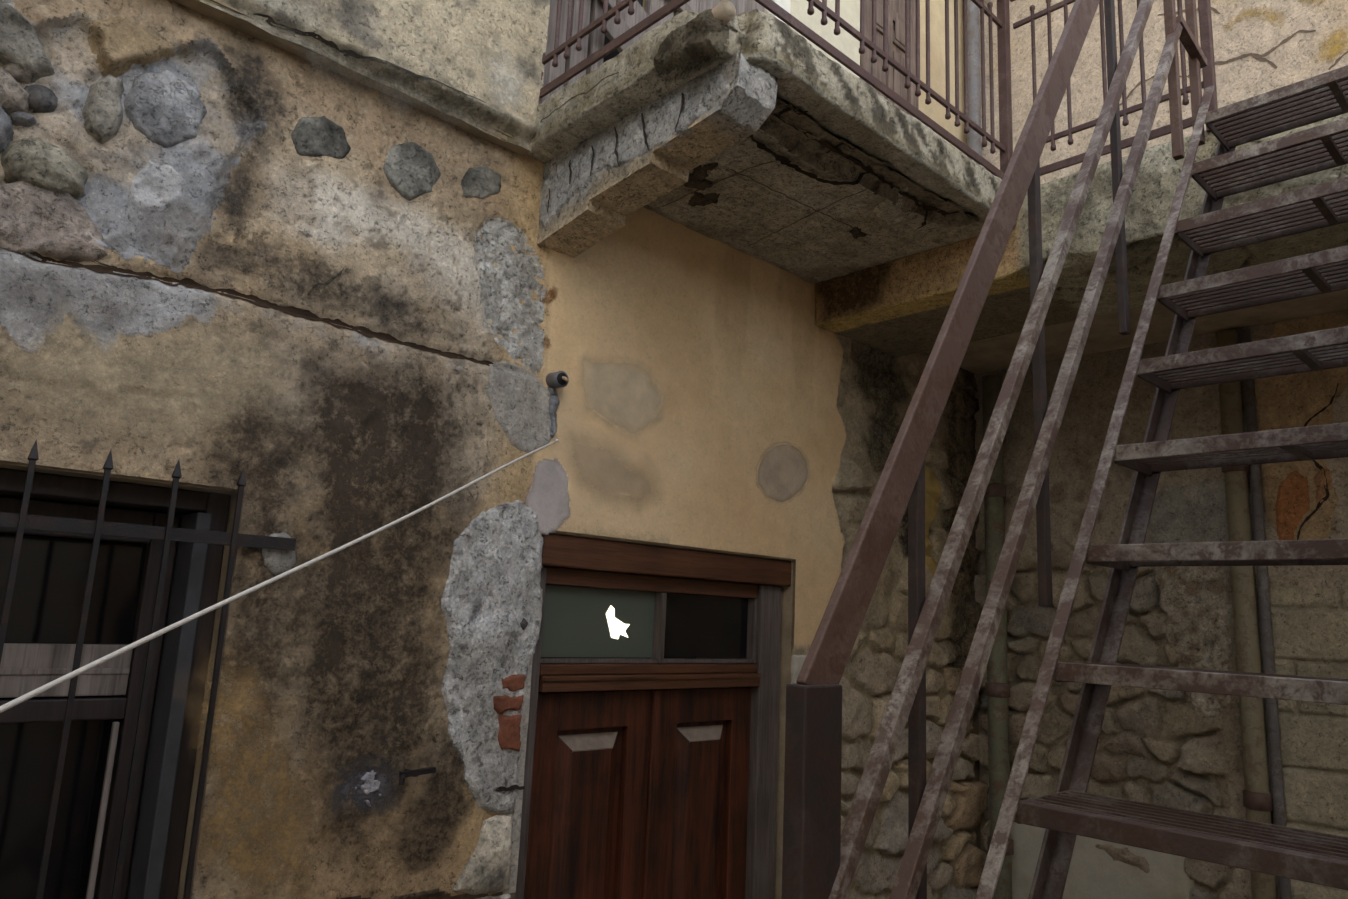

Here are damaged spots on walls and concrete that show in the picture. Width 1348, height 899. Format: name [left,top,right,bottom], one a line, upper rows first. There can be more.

spalling [0,0,268,354]
spalling [383,140,441,203]
peeling [540,9,729,228]
crack [662,107,970,246]
crack [1096,30,1316,119]
crack [1328,51,1348,70]
crack [4,248,494,366]
spalling [474,218,547,375]
crack [1297,460,1329,540]
water stain [24,327,462,844]
flaking render [493,674,526,751]
water stain [400,741,469,870]